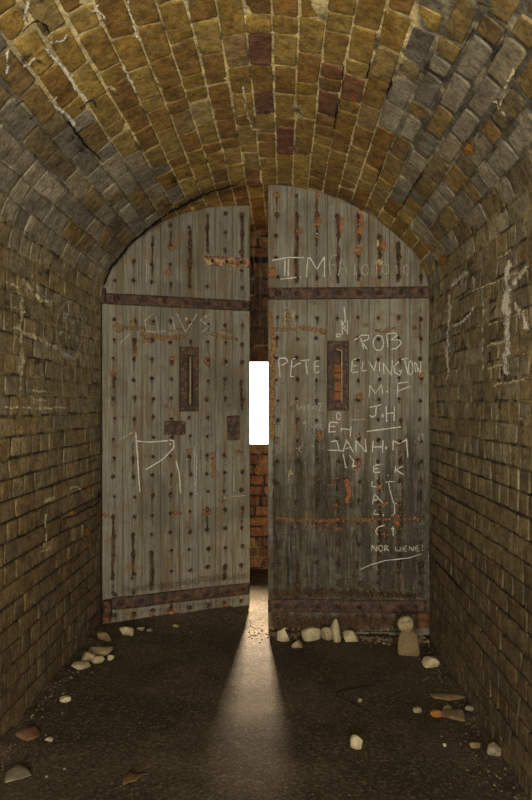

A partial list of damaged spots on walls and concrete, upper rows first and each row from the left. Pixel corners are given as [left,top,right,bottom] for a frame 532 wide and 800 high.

crack [22,20,50,34]
crack [333,65,344,129]
crack [67,99,103,160]
rust [294,211,303,283]
rust [272,478,423,599]
rust [271,613,419,632]